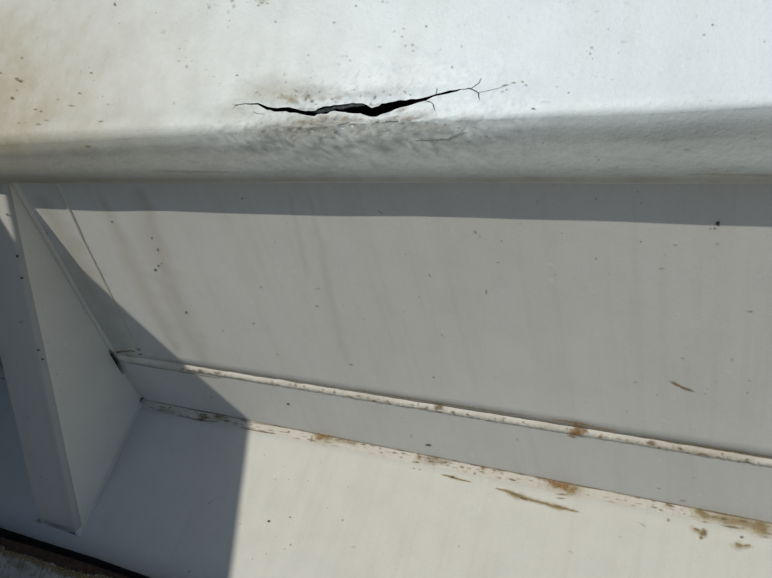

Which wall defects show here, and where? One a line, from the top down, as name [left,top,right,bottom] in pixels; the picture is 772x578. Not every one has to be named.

crack [233,79,507,124]